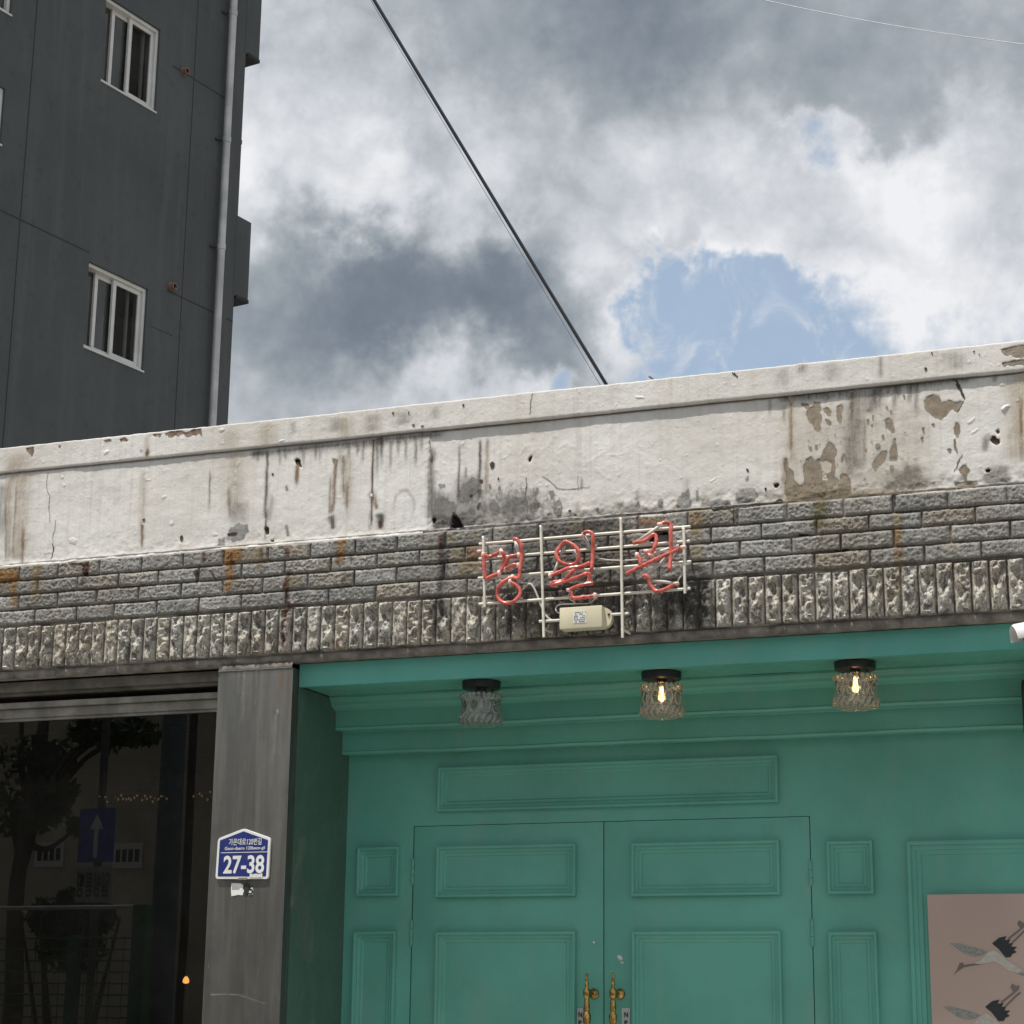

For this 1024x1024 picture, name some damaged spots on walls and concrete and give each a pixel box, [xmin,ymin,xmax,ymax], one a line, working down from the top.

peeling [1001,345,1024,365]
peeling [153,429,202,437]
peeling [773,402,918,504]
peeling [921,394,963,453]
crack [45,475,89,576]
leakage [428,442,758,634]
rust [224,548,241,591]